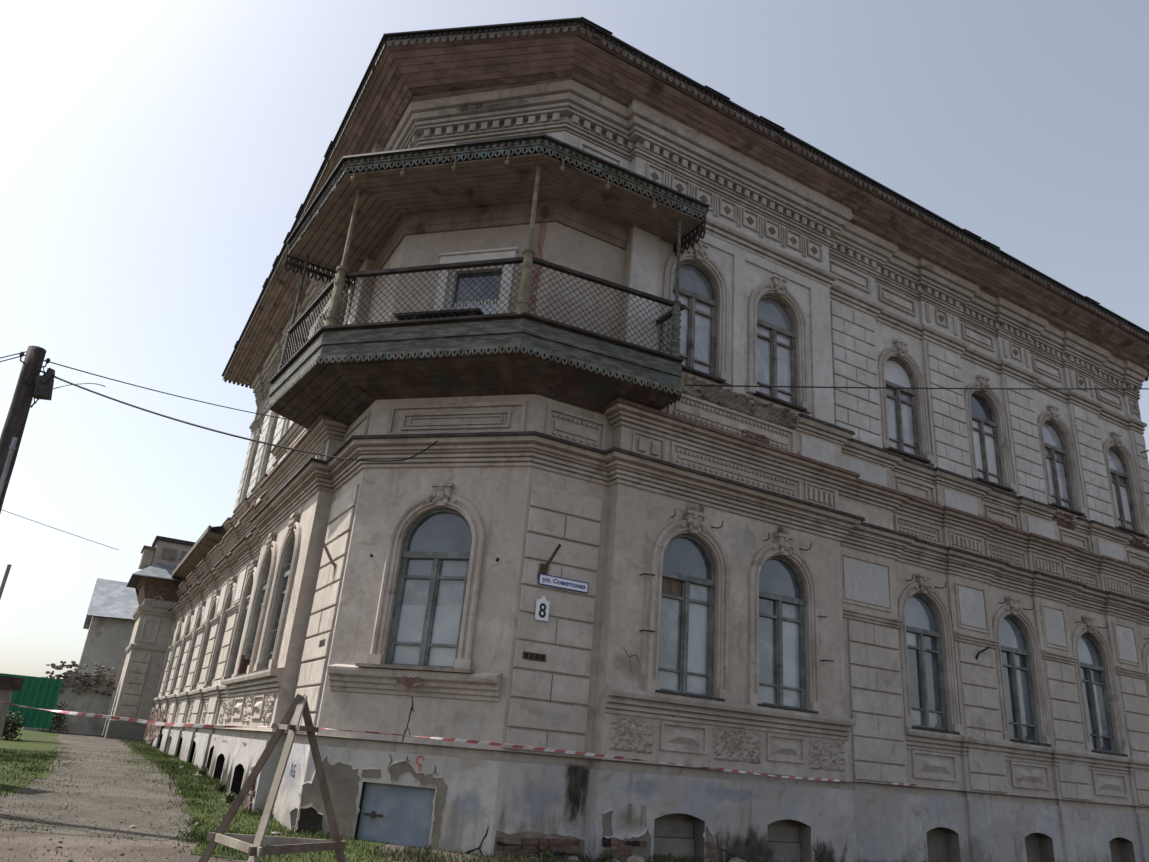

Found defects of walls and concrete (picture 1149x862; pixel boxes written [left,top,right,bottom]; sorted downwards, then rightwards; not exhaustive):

crack [388,696,438,776]
flaking render [244,764,258,811]
flaking render [296,754,448,850]
leakage [566,766,588,818]
flaking render [492,828,585,859]
flaking render [599,808,652,862]